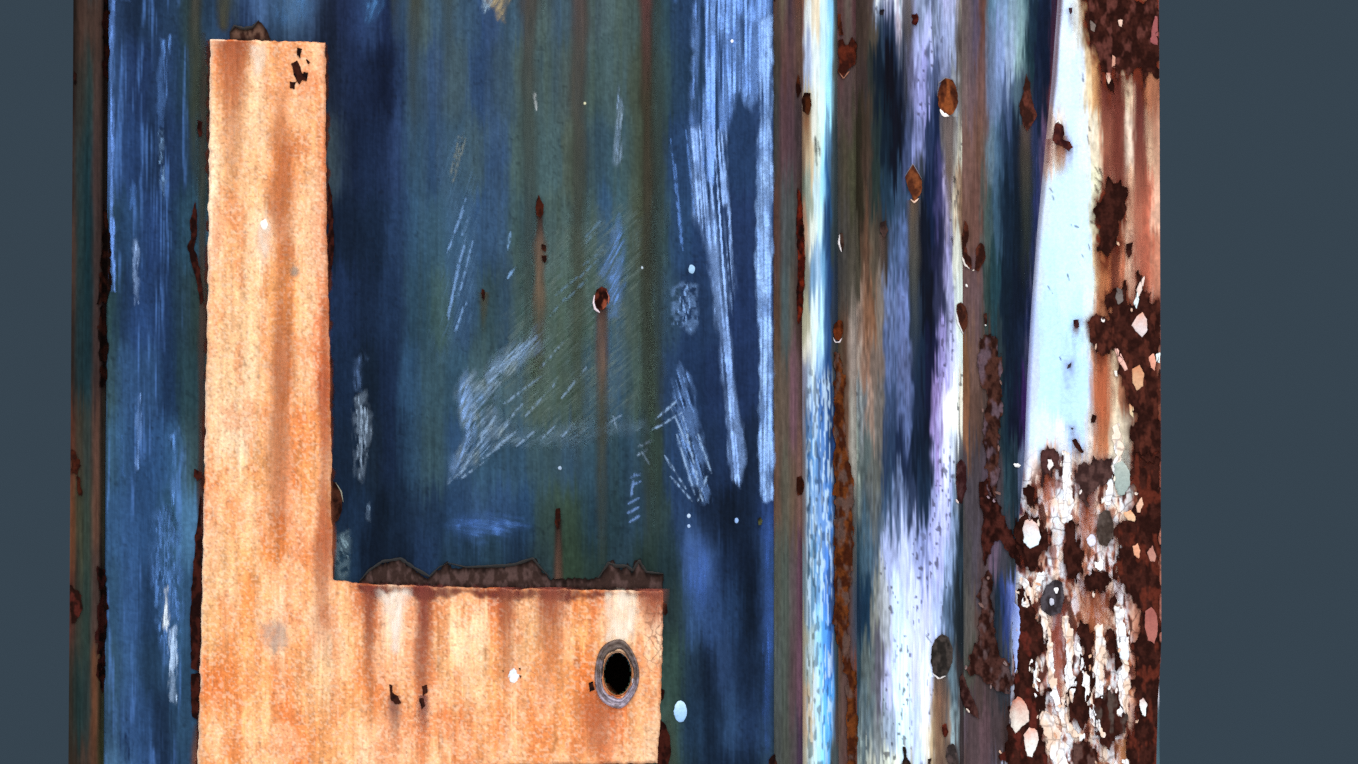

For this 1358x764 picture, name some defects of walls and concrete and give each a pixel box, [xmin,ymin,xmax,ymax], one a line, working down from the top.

corrosion [192,0,206,562]
corrosion [593,287,610,430]
corrosion [956,0,1161,764]
corrosion [319,481,343,570]
corrosion [359,508,660,667]
corrosion [832,320,858,764]
peeling [1023,519,1041,548]
spalling [1047,451,1074,524]
peeling [1087,534,1103,571]
spalling [1101,423,1143,521]
peeling [1133,543,1156,562]
spalling [1009,571,1158,764]